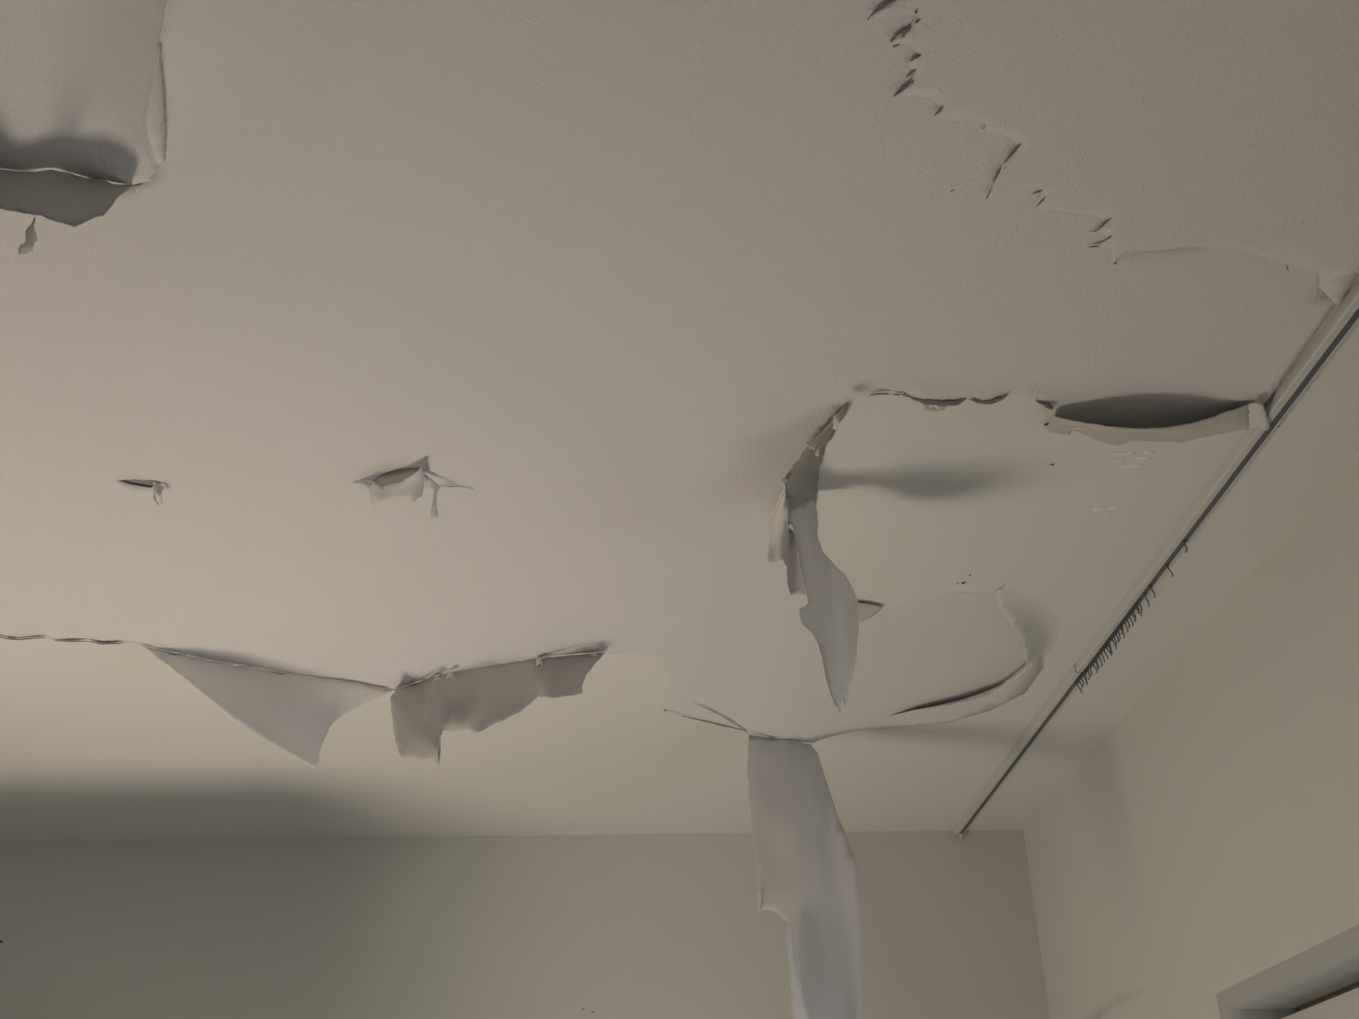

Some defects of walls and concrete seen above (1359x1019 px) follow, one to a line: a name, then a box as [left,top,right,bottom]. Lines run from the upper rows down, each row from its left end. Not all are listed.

crack [867,0,921,97]
crack [986,144,1021,199]
crack [1089,218,1117,265]
peeling [0,0,1336,769]
crack [0,637,179,655]
peeling [747,735,863,1019]